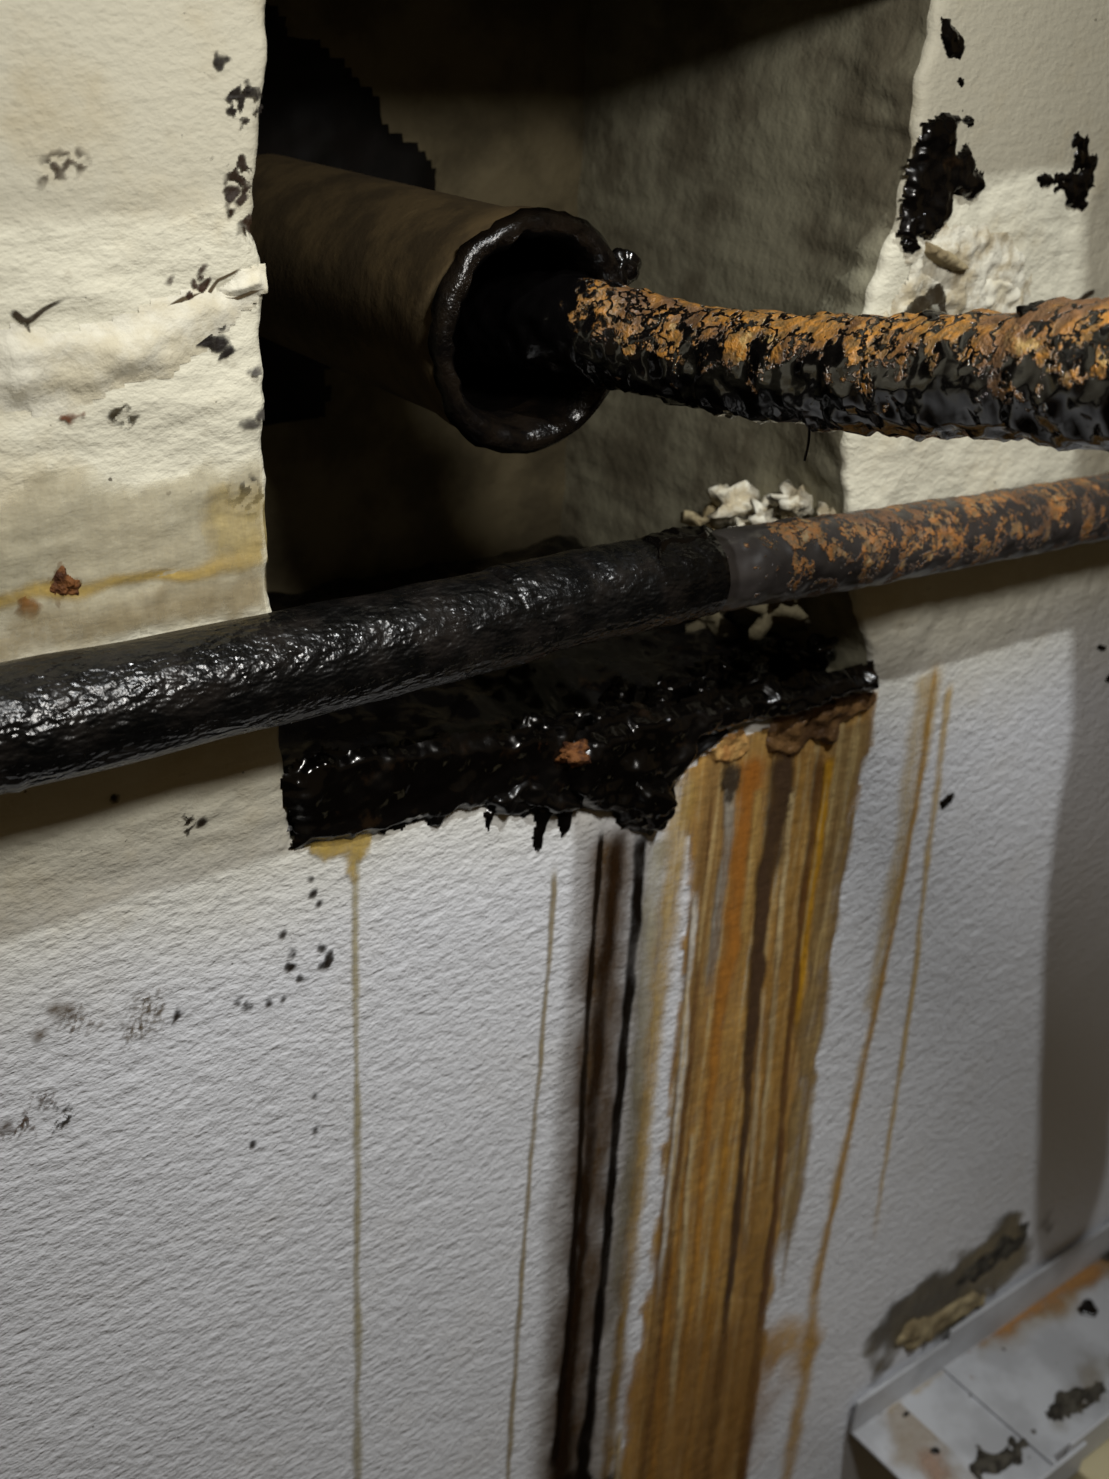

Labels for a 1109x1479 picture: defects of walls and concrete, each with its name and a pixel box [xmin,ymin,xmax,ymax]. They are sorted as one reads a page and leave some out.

spalling [881,222,1032,317]
leakage [311,834,372,1007]
leakage [548,835,668,1479]
rust [602,690,878,1479]
leakage [761,679,951,1475]